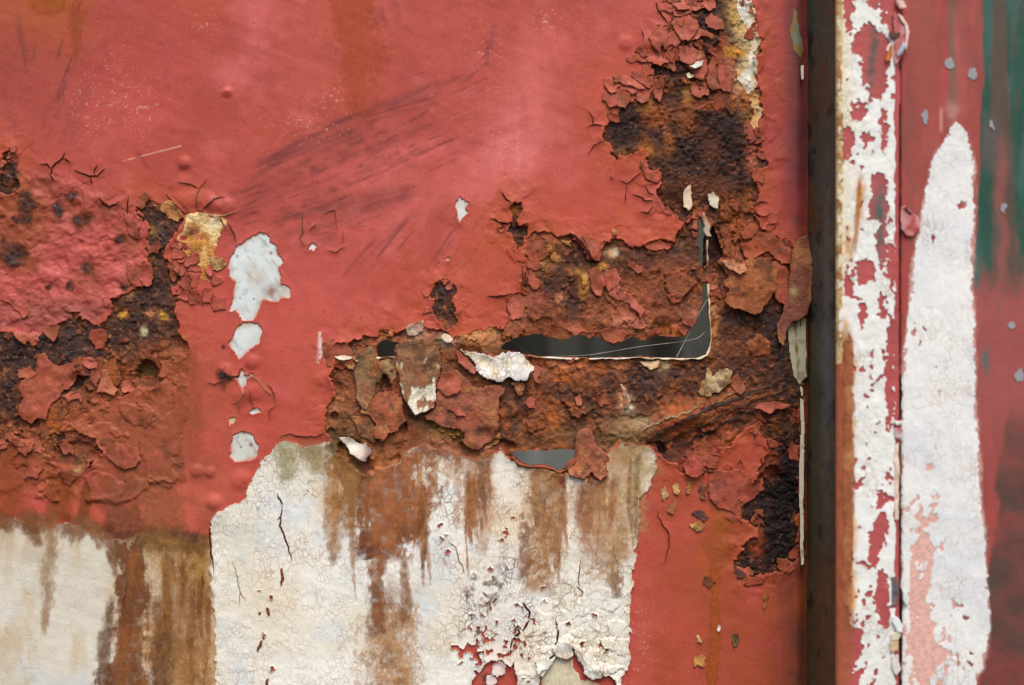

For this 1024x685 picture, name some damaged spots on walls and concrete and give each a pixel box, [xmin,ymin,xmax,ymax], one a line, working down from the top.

corrosion [0,145,39,224]
crack [41,152,129,214]
corrosion [0,191,190,486]
peeling [160,200,290,388]
corrosion [218,370,232,386]
corrosion [322,0,808,685]
corrosion [0,510,50,544]
crack [277,493,292,586]
corrosion [62,515,210,685]
crack [193,522,270,652]
peeling [486,660,506,685]
peeling [534,641,604,685]